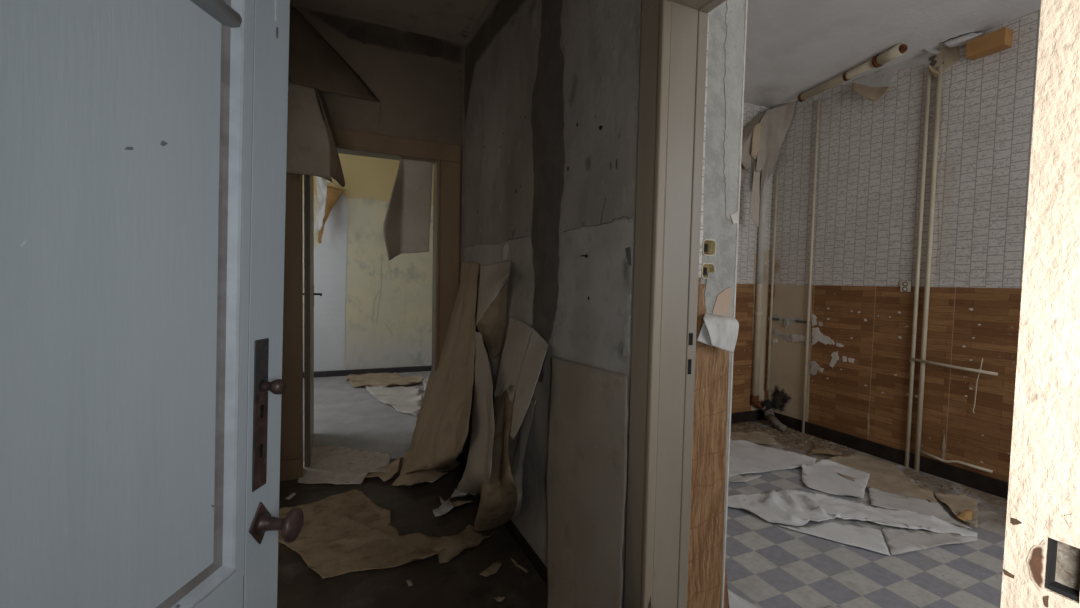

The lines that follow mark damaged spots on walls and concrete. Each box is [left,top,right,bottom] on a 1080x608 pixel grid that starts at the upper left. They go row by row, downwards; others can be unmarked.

peeling [275,0,380,102]
peeling [723,0,745,224]
spalling [768,307,855,379]